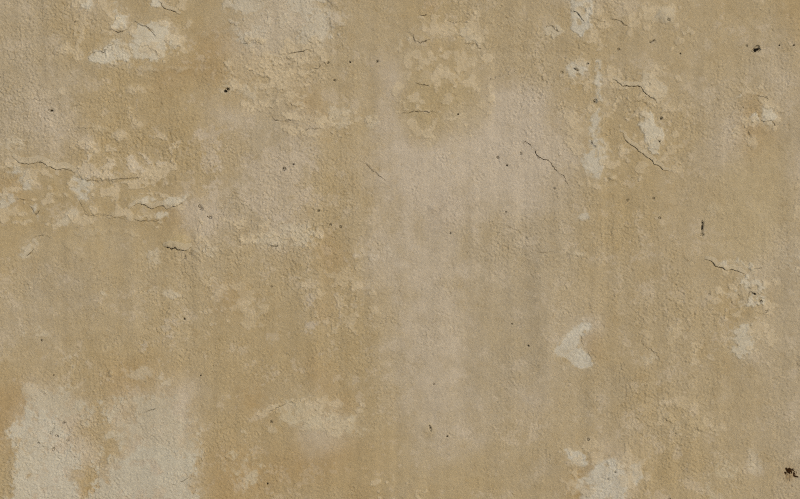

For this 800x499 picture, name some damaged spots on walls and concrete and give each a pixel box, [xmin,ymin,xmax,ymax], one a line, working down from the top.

crack [12,154,80,177]
spalling [0,0,378,265]
peeling [537,0,688,191]
peeling [547,315,599,375]
peeling [0,348,372,499]
peeling [557,432,652,499]